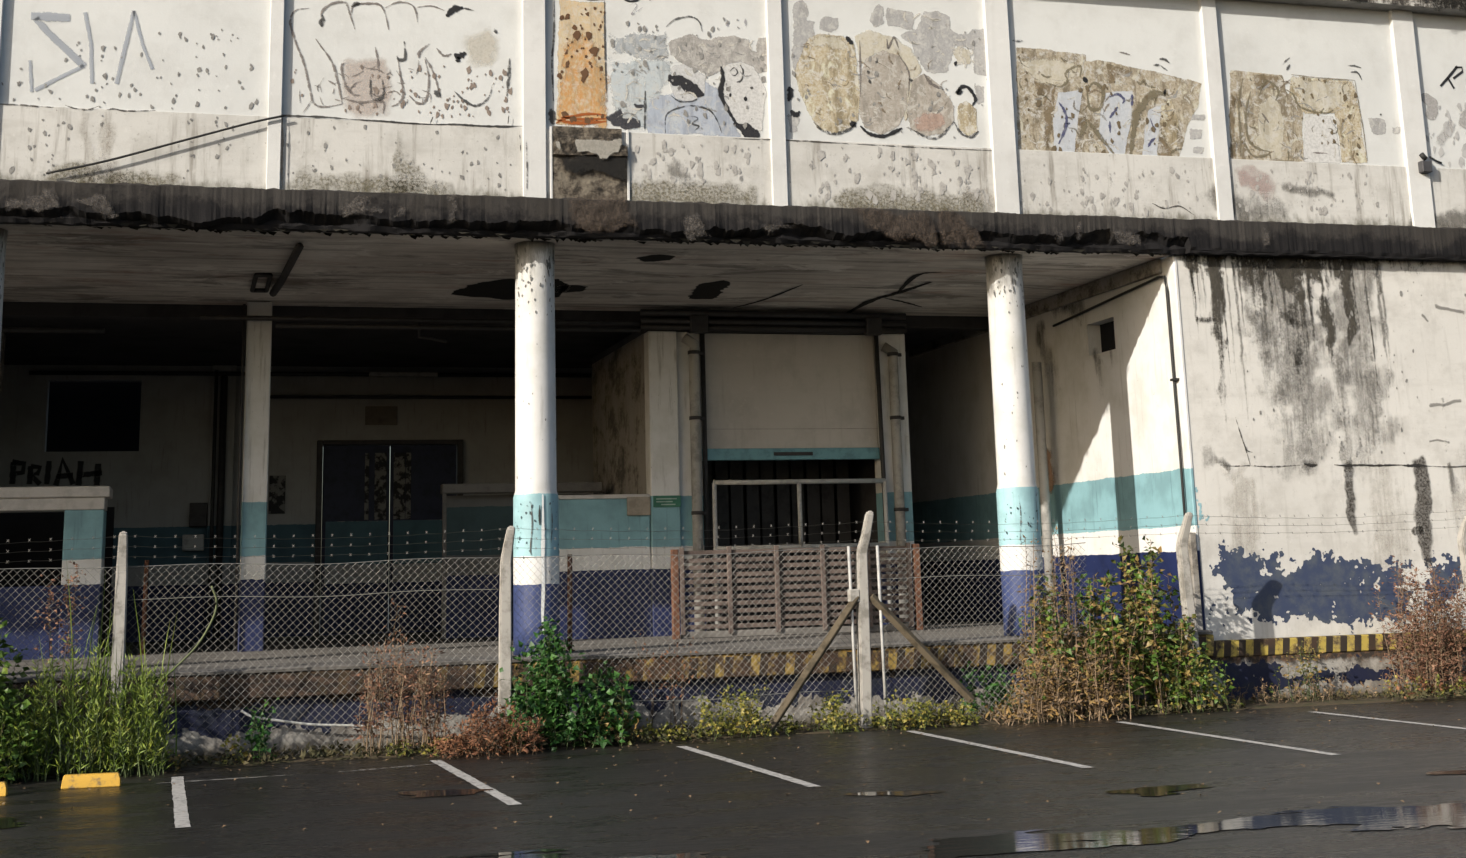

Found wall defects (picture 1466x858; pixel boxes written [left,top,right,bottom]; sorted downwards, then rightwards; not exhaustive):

peeling [610,21,671,108]
spalling [633,17,759,190]
spalling [1018,51,1198,240]
spalling [570,195,635,231]
spalling [1288,170,1387,223]
damp [1180,255,1431,418]
damp [1344,462,1356,534]
damp [1412,457,1432,566]
peeling [1209,539,1463,634]